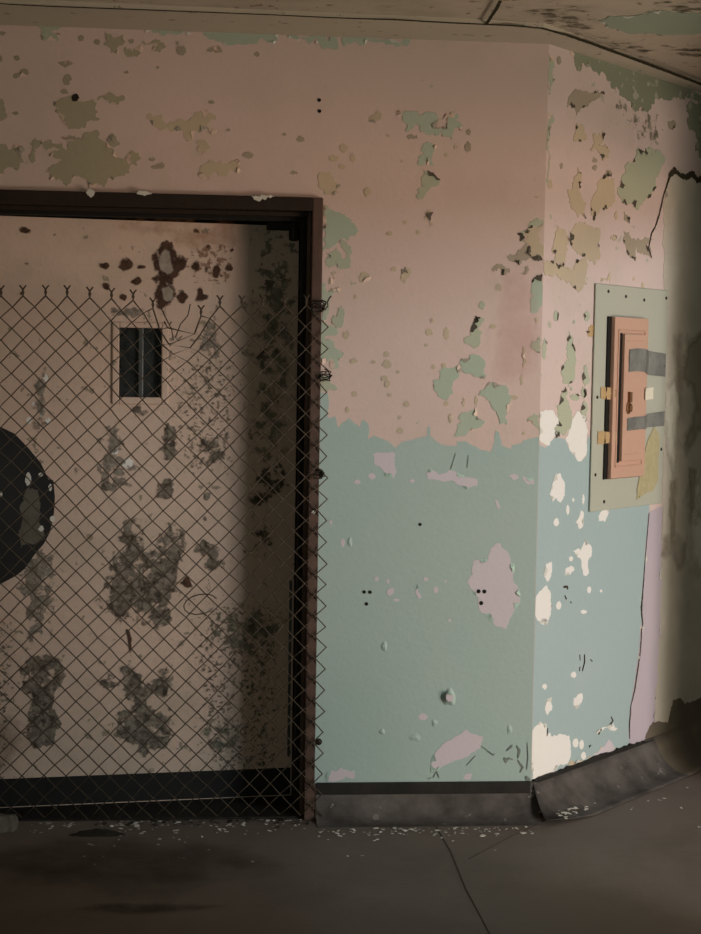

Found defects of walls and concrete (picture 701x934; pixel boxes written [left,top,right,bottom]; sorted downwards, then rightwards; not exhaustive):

peeling [527,1,701,53]
peeling [0,60,165,189]
peeling [397,111,471,200]
crack [648,167,701,258]
peeling [431,301,518,437]
flaking render [492,51,701,779]
damp [665,335,701,537]
peeling [467,543,521,630]
damp [211,605,287,684]
peeling [326,768,355,782]
peeling [430,730,483,773]
crack [435,821,546,934]